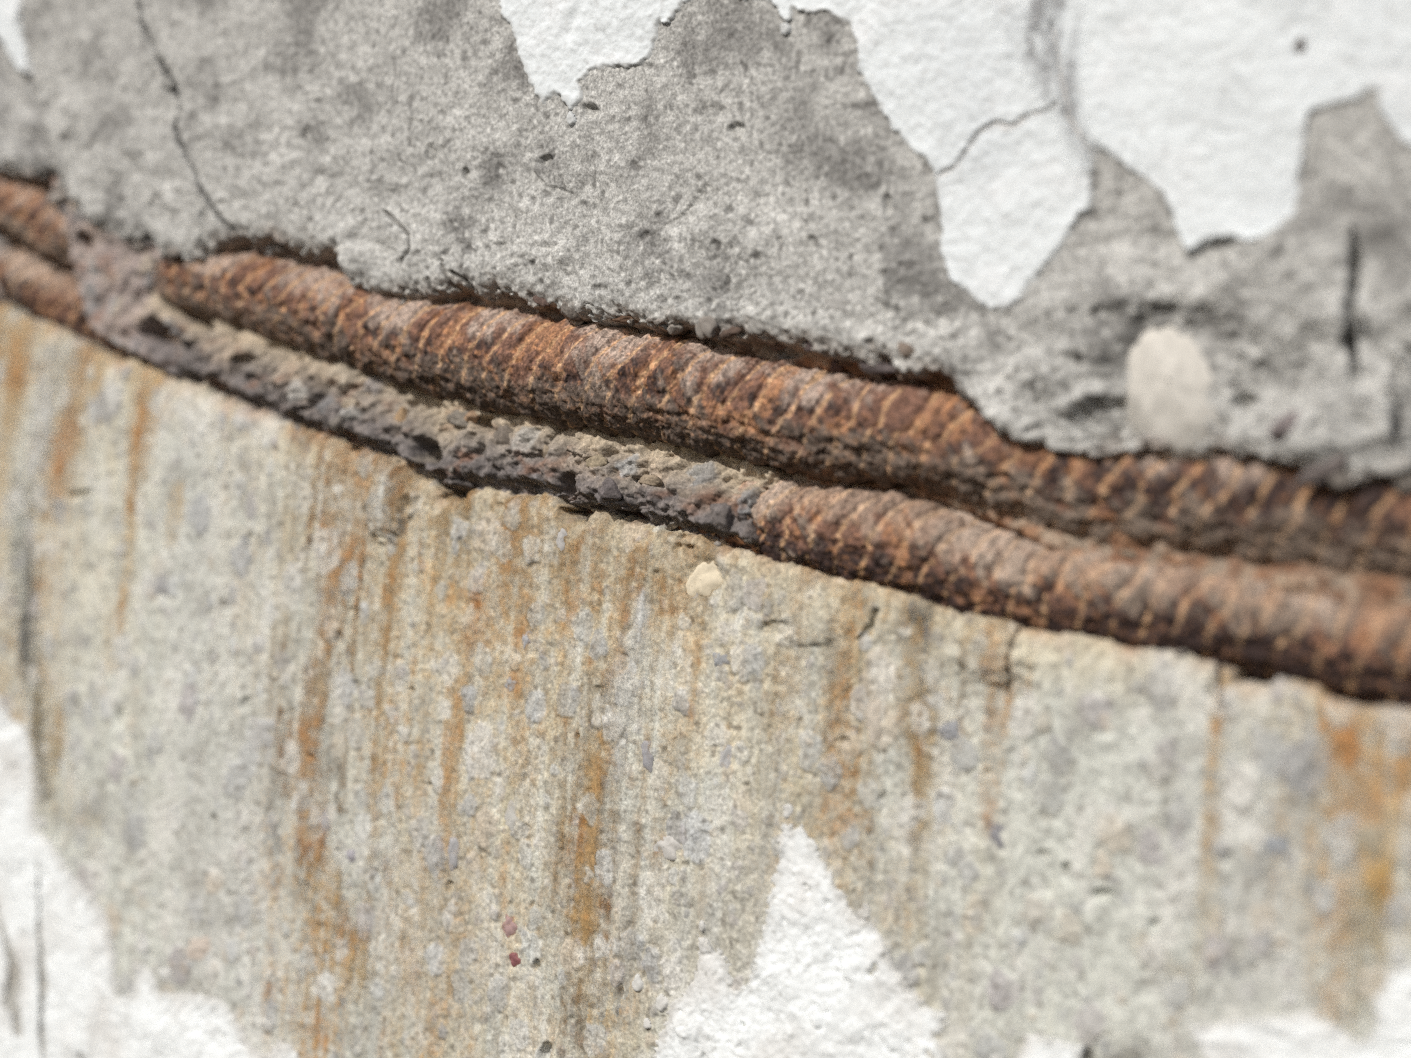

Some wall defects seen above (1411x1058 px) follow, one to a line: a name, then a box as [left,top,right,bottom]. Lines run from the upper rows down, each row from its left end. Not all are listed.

crack [137,0,238,234]
crack [936,23,1095,178]
corrosion [126,371,166,541]
peeling [0,0,1411,708]
crack [1343,306,1409,451]
corrosion [427,490,479,652]
corrosion [549,536,579,606]
corrosion [300,984,340,1058]